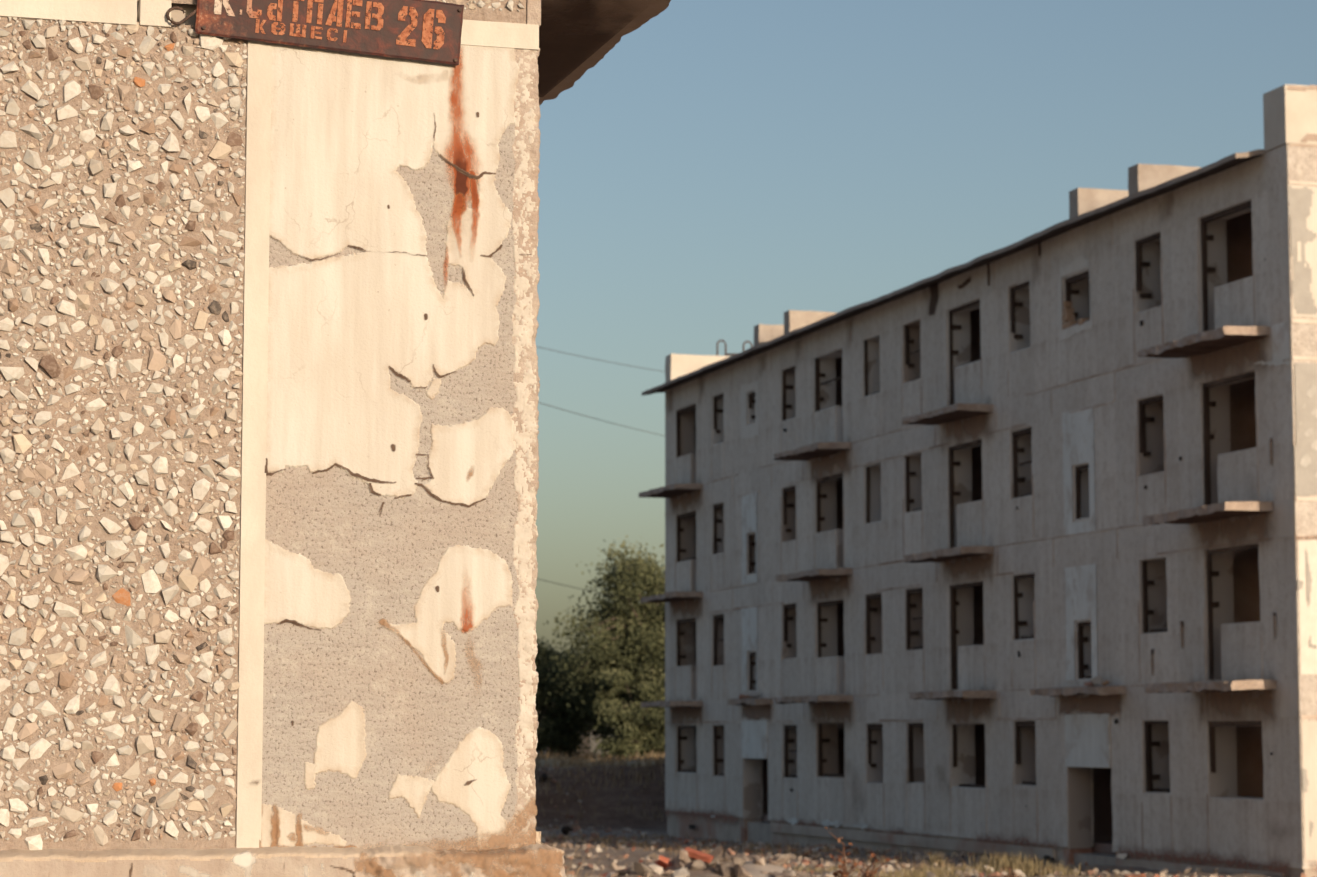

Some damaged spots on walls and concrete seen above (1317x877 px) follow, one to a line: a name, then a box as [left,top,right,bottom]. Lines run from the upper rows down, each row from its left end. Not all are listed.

water stain [537,0,629,97]
corrosion [447,54,479,242]
peeling [1288,186,1317,315]
peeling [261,48,541,852]
corrosion [462,607,473,632]